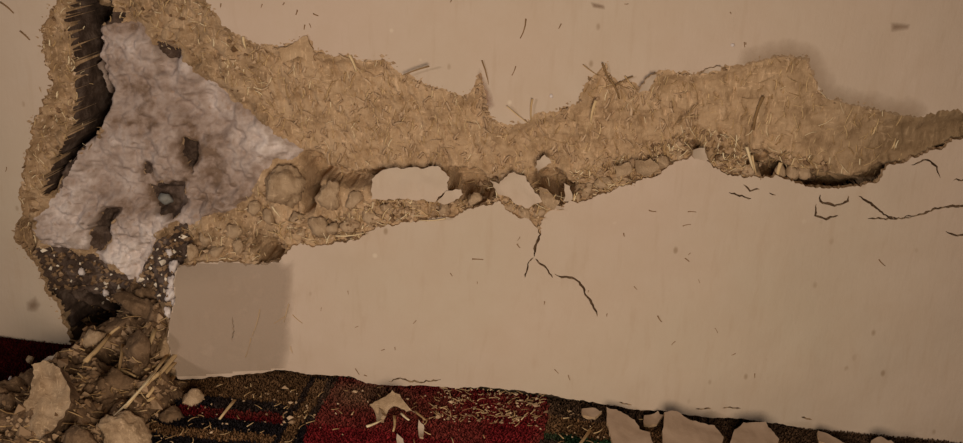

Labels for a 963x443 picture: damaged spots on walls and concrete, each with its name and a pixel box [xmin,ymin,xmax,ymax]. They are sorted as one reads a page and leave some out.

flaking render [11,0,285,364]
crack [525,225,598,315]
flaking render [256,34,963,256]
crack [814,196,963,220]